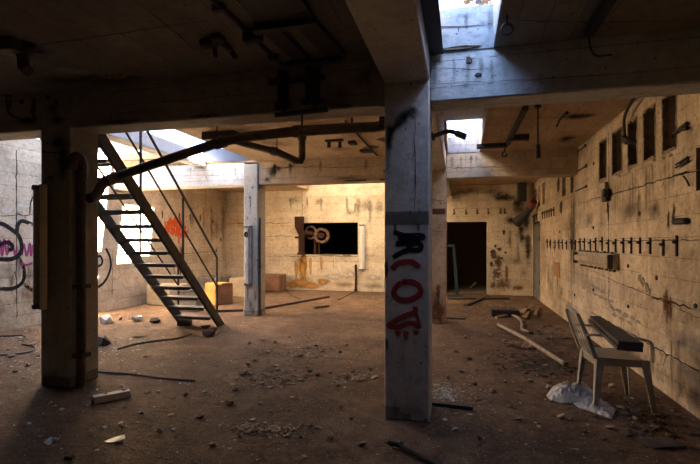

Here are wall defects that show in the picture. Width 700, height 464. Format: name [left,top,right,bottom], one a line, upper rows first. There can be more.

rust [289,255,329,289]
spalling [490,244,507,280]
crack [585,268,699,392]